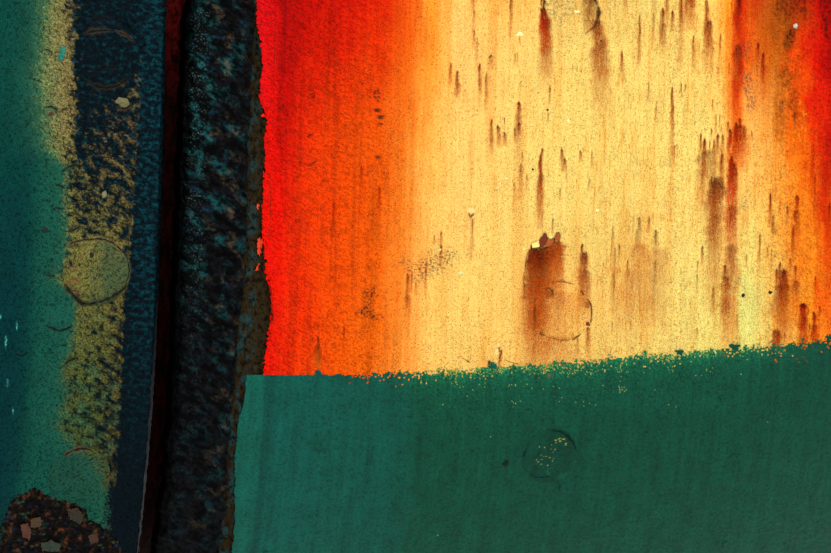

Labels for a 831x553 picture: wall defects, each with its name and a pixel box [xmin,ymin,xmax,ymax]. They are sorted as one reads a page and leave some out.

corrosion [540,0,551,54]
corrosion [585,0,605,61]
corrosion [660,0,695,38]
corrosion [705,1,721,55]
corrosion [731,0,742,103]
corrosion [491,102,521,142]
corrosion [700,117,746,255]
corrosion [523,241,565,335]
corrosion [578,244,588,287]
corrosion [772,262,796,360]
corrosion [800,303,817,343]
spalling [0,487,121,553]